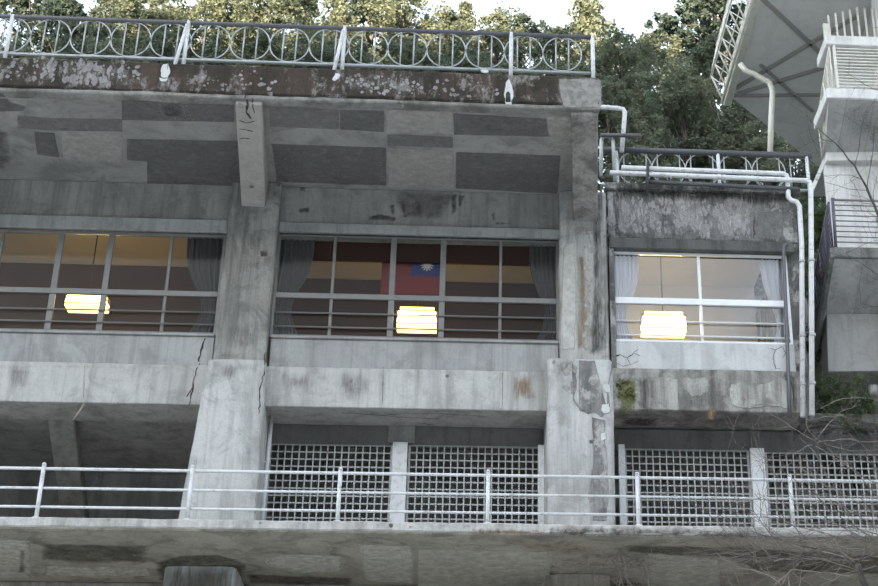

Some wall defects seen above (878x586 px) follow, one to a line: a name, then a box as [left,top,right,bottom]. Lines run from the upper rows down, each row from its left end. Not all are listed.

peeling [1,55,141,89]
peeling [159,64,170,82]
peeling [232,70,277,96]
crack [239,94,255,139]
damp [269,106,560,221]
crack [186,338,206,405]
crack [258,353,266,412]
flaking render [552,196,753,521]
flaking render [730,377,793,409]